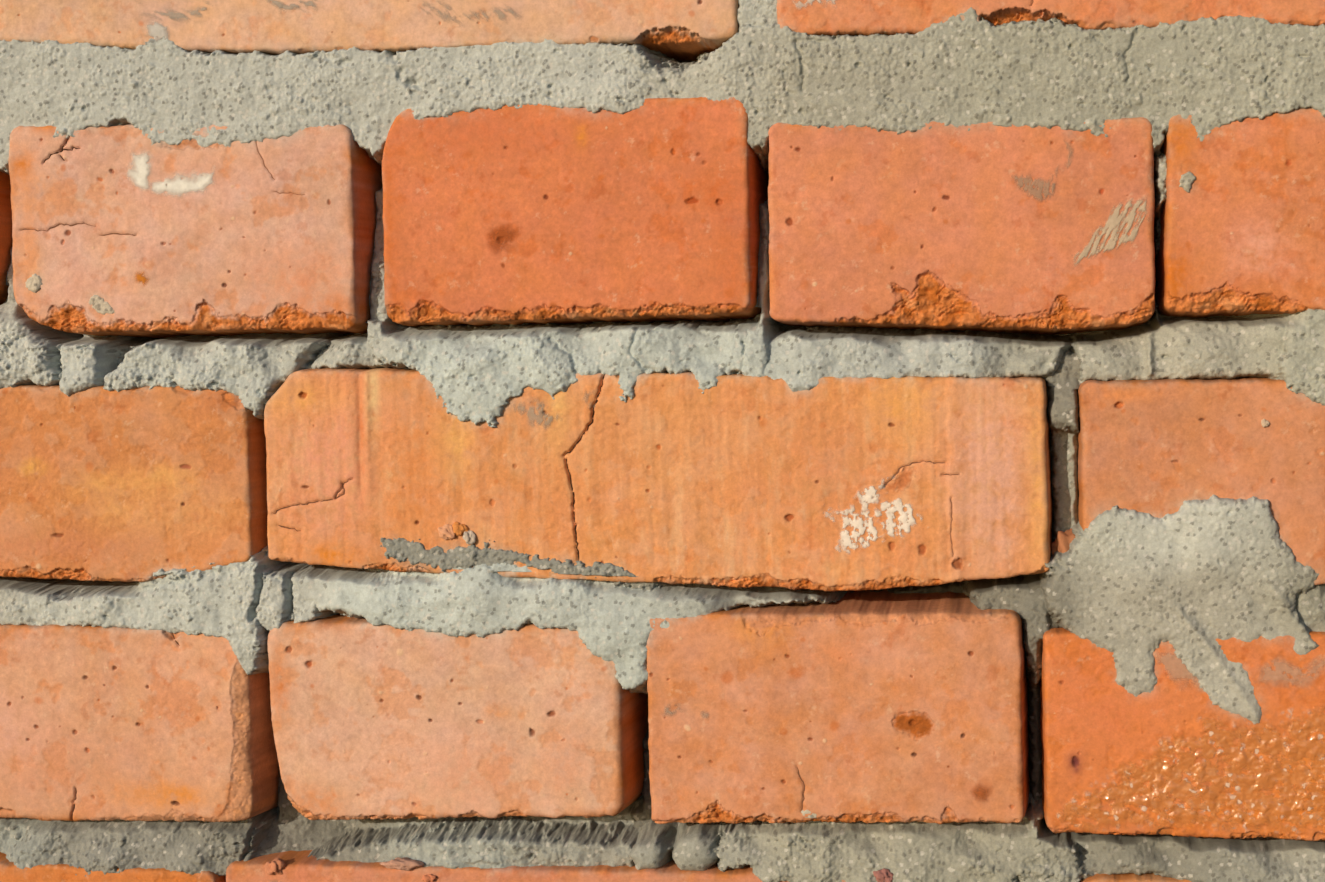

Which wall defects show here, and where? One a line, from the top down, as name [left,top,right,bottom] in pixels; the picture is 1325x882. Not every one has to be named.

spalling [632,26,718,54]
crack [44,138,80,162]
crack [22,223,135,236]
spalling [0,271,370,336]
spalling [385,300,759,326]
spalling [822,270,1308,332]
crack [565,374,605,561]
leakage [826,480,921,553]
crack [886,461,958,557]